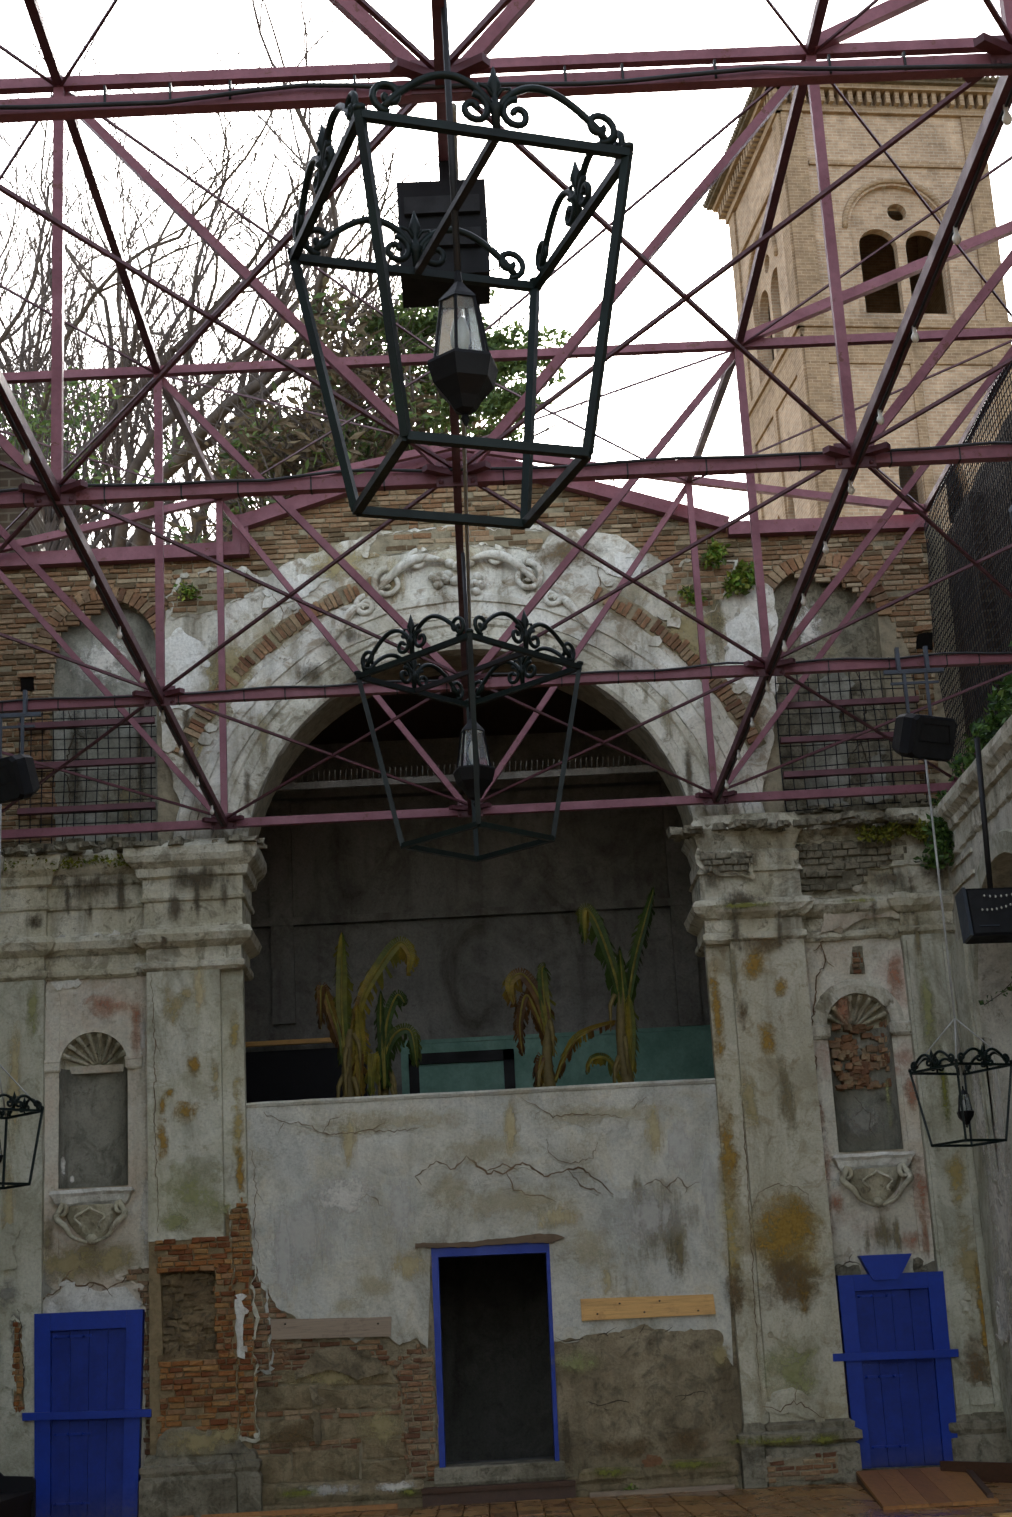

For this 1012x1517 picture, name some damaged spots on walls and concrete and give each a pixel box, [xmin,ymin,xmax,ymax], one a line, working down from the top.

spalling [666,672,919,974]
spalling [829,1019,892,1091]
crack [251,1113,417,1264]
crack [415,1097,697,1205]
leakage [626,1071,820,1311]
peeling [971,1050,1012,1349]
spalling [9,1315,29,1417]
spalling [43,1192,275,1466]
spalling [294,1346,439,1482]